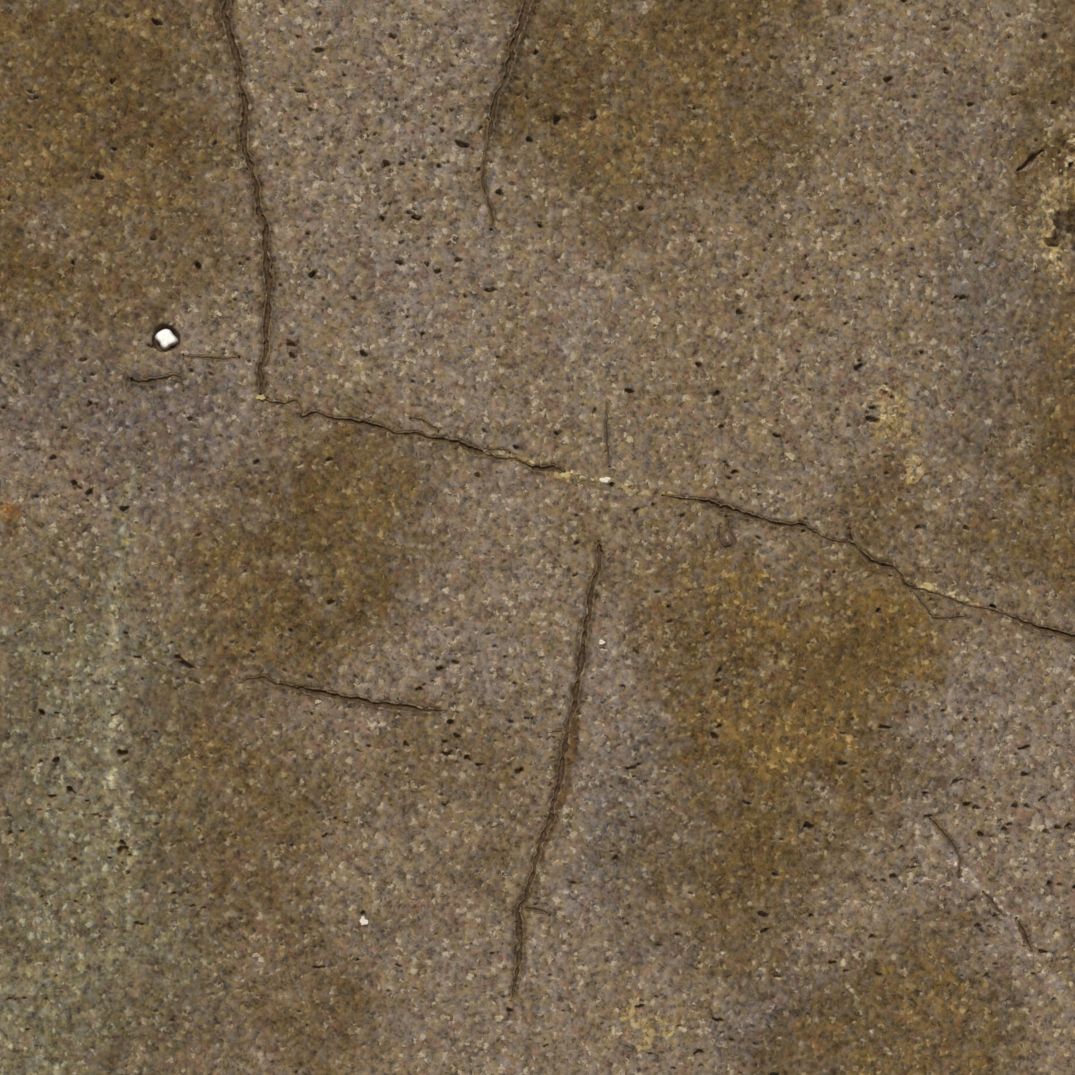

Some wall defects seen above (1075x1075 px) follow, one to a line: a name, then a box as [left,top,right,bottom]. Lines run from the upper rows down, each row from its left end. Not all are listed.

crack [131,0,1075,642]
crack [230,675,446,715]
crack [509,541,605,1001]